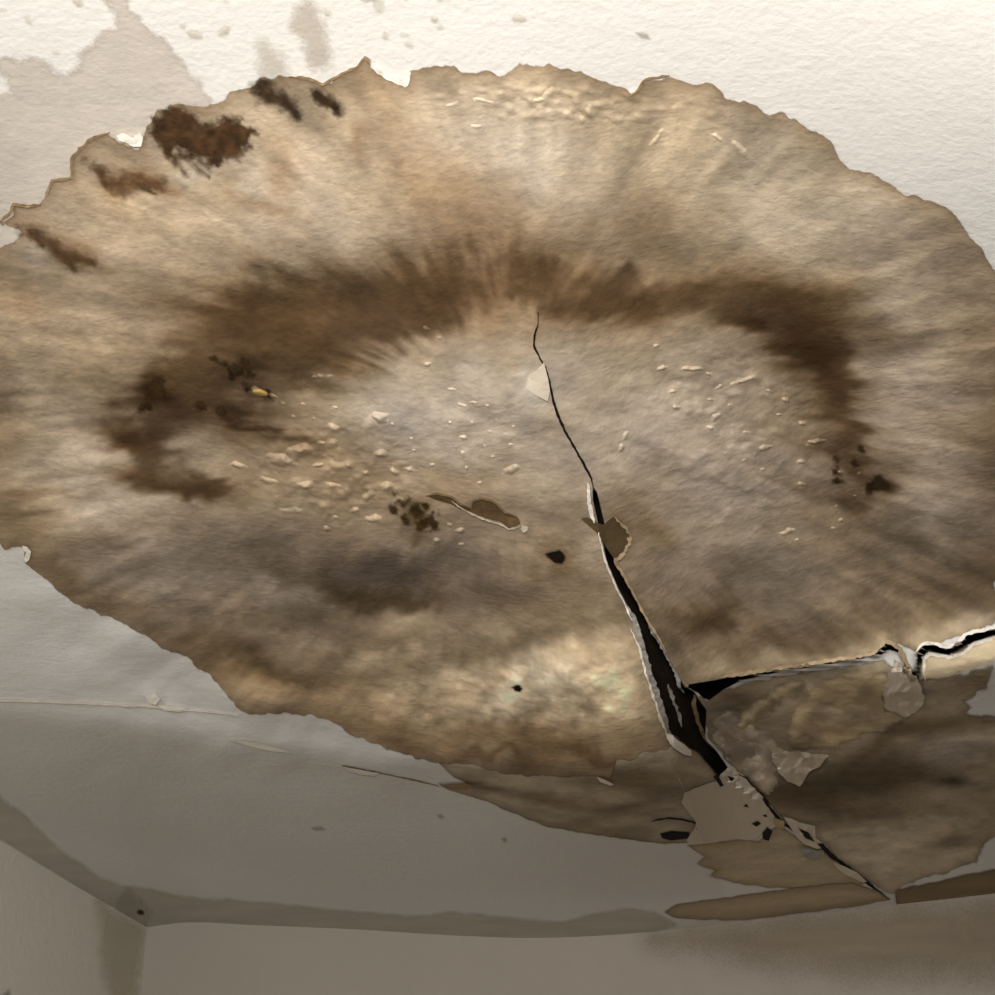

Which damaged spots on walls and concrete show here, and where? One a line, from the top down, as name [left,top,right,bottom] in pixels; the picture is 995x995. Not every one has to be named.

leakage [0,0,210,220]
leakage [293,5,326,65]
leakage [0,56,995,844]
crack [526,312,995,900]
leakage [666,639,995,972]